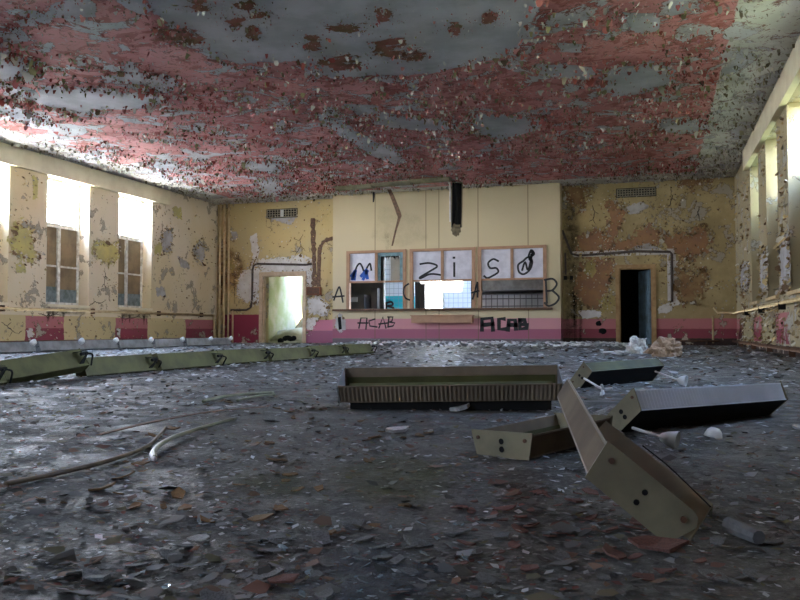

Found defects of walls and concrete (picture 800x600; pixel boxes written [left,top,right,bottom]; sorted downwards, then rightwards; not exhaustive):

peeling [0,0,800,350]